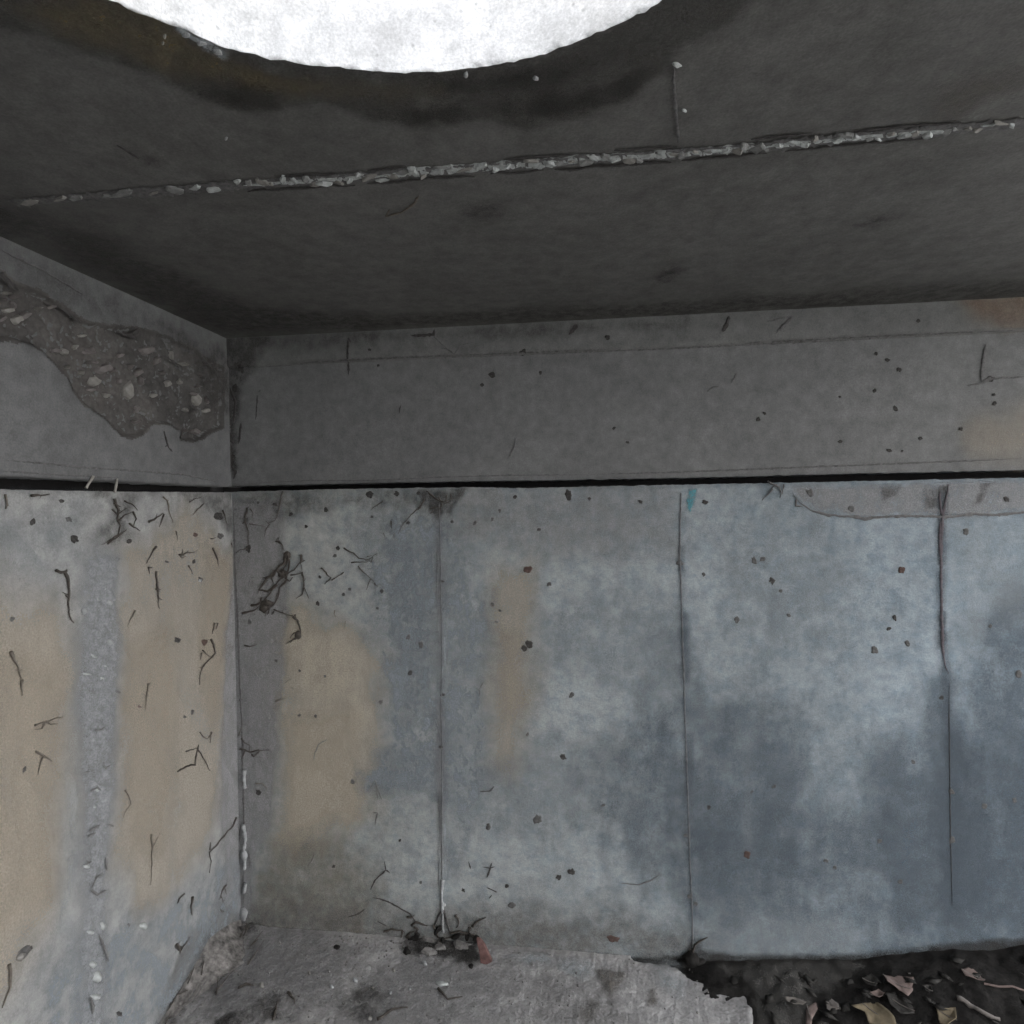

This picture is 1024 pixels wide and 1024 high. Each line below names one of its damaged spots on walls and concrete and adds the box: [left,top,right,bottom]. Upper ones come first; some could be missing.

spalling [0,269,244,443]
water stain [0,0,745,128]
crack [248,122,961,217]
water stain [48,502,612,1024]
crack [433,503,443,888]
crack [611,458,1024,948]